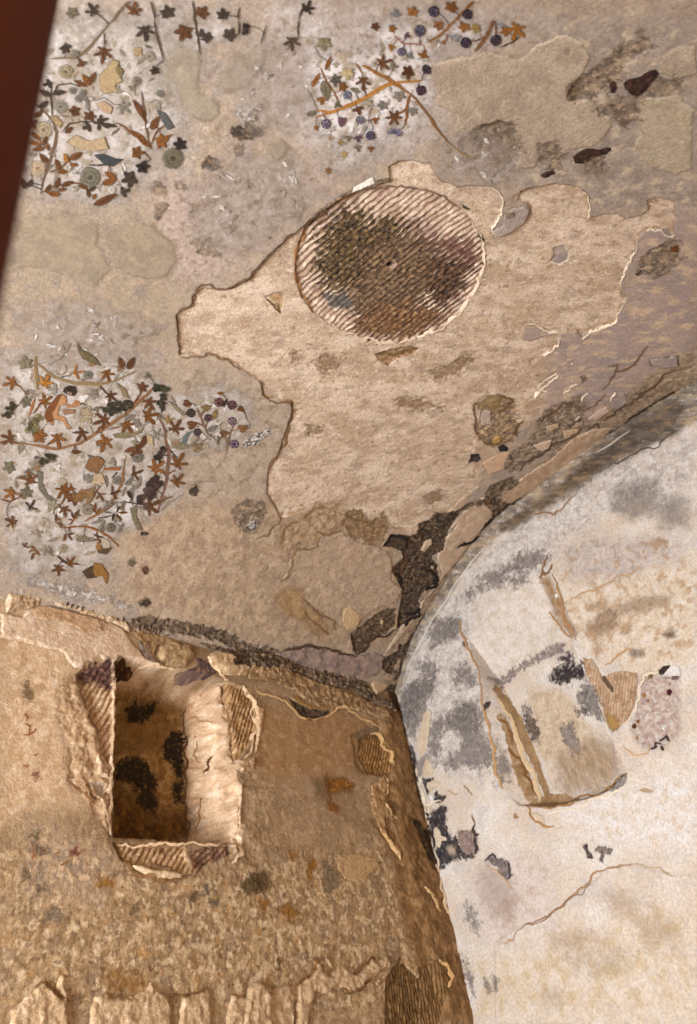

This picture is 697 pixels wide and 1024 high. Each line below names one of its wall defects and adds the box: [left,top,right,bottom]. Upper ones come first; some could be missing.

leakage [610,70,659,96]
spalling [176,120,684,681]
crack [580,347,679,439]
crack [457,495,525,548]
crack [399,613,426,674]
leakage [387,547,546,784]
spalling [57,657,264,883]
leakage [411,772,513,891]
leakage [583,843,613,863]
crack [505,863,674,944]
flaking render [89,981,211,1024]
flaking render [226,956,455,1024]